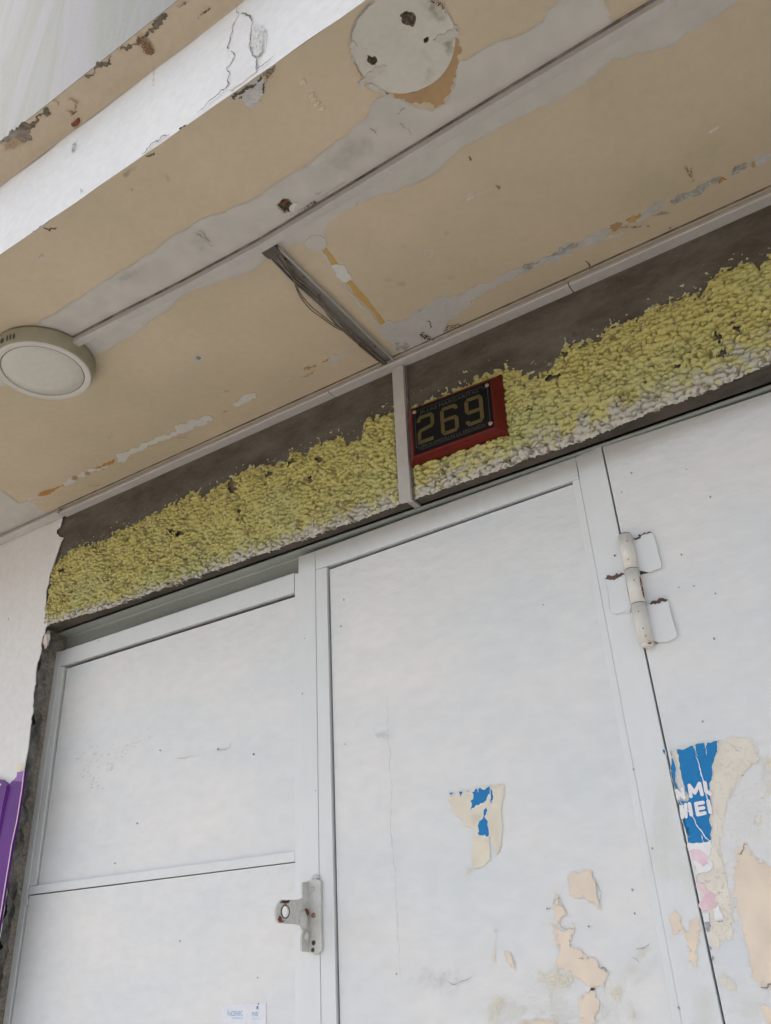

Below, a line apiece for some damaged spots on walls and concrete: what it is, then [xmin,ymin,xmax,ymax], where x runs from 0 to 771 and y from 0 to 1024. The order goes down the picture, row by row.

spalling [0,107,51,154]
crack [144,4,272,157]
flaking render [38,0,614,336]
peeling [305,153,771,353]
peeling [0,390,257,536]
peeling [515,869,636,1024]
peeling [668,908,722,969]
peeling [727,842,771,989]